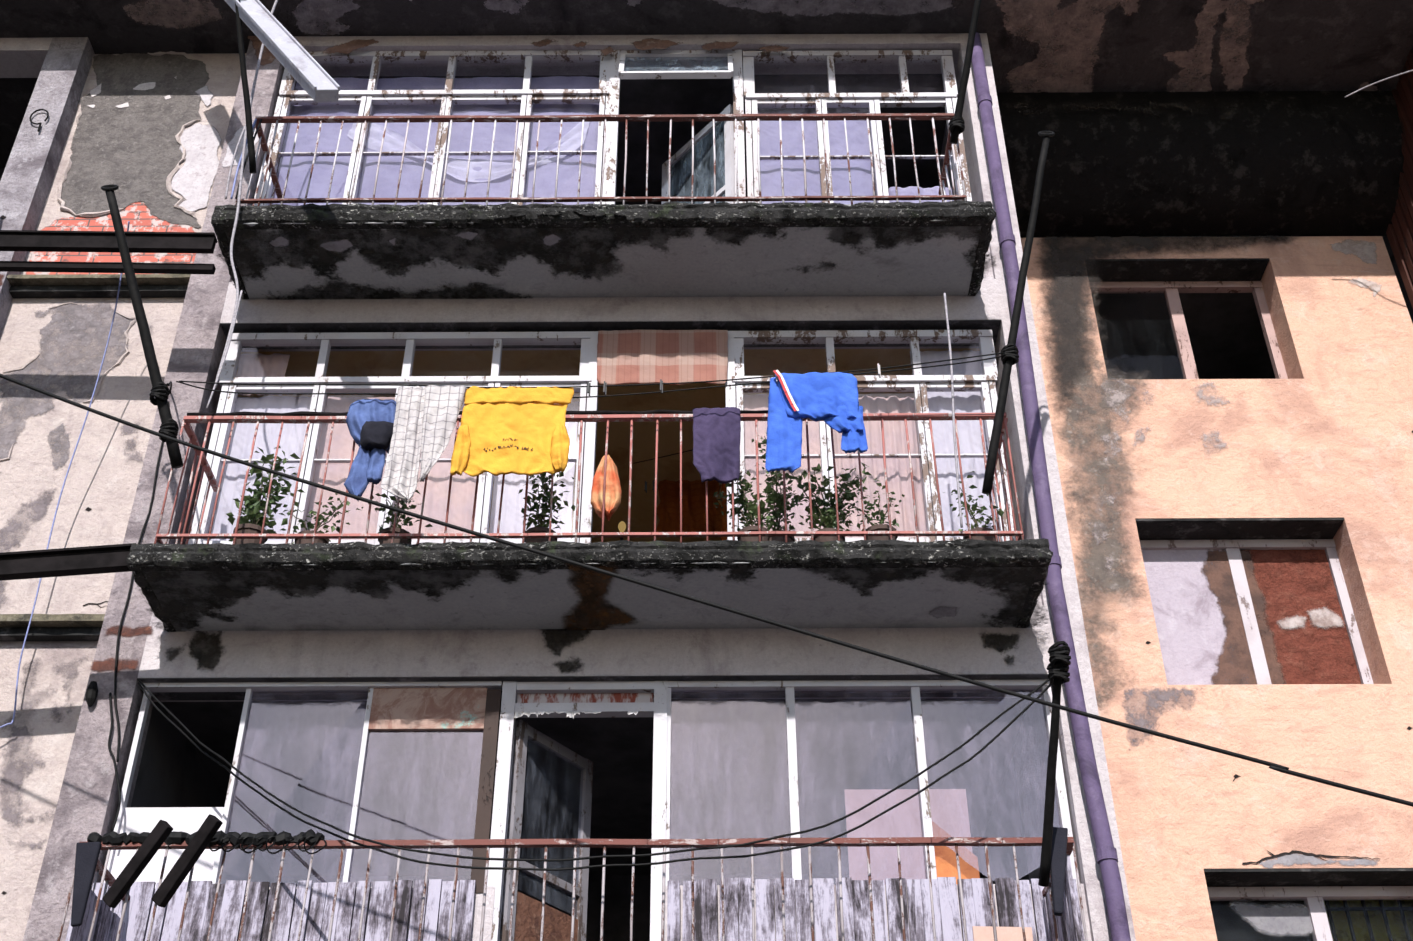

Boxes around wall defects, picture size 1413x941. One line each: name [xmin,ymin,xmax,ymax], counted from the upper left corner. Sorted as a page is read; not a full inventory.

peeling [995,0,1139,93]
peeling [1163,0,1264,92]
flaking render [42,51,259,232]
flaking render [26,251,196,275]
damp [216,213,996,300]
flaking render [0,302,151,469]
damp [1061,301,1195,750]
damp [136,556,582,669]
damp [541,629,592,673]
damp [774,556,1048,664]
damp [0,660,49,848]
flaking render [1260,854,1377,868]